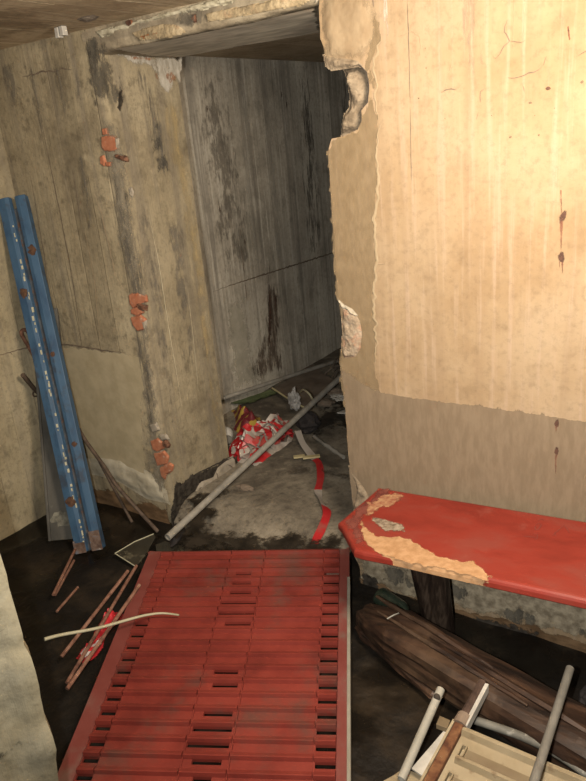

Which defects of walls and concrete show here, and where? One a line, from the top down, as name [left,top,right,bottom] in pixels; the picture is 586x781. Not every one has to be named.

leakage [115,8,320,57]
leakage [86,37,124,111]
peeling [323,17,381,407]
corrosion [558,190,566,273]
leakage [313,371,586,522]
leakage [93,456,343,551]
spalling [348,465,369,508]
leakage [359,574,391,592]
leakage [453,609,586,653]